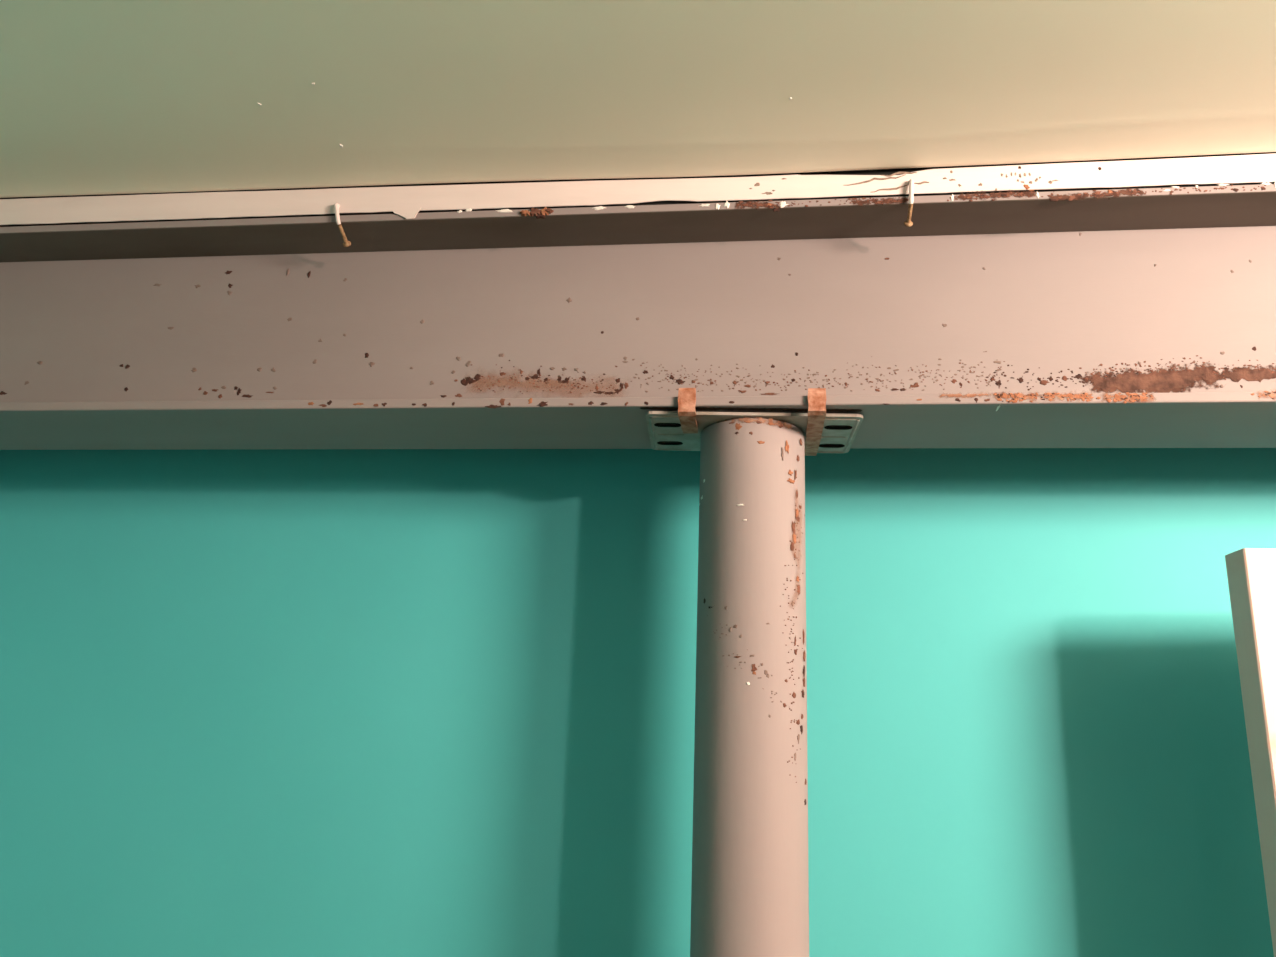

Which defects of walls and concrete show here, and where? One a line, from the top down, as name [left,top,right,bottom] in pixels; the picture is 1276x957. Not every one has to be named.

crack [800,167,930,192]
corrosion [198,367,277,398]
corrosion [430,347,1276,784]